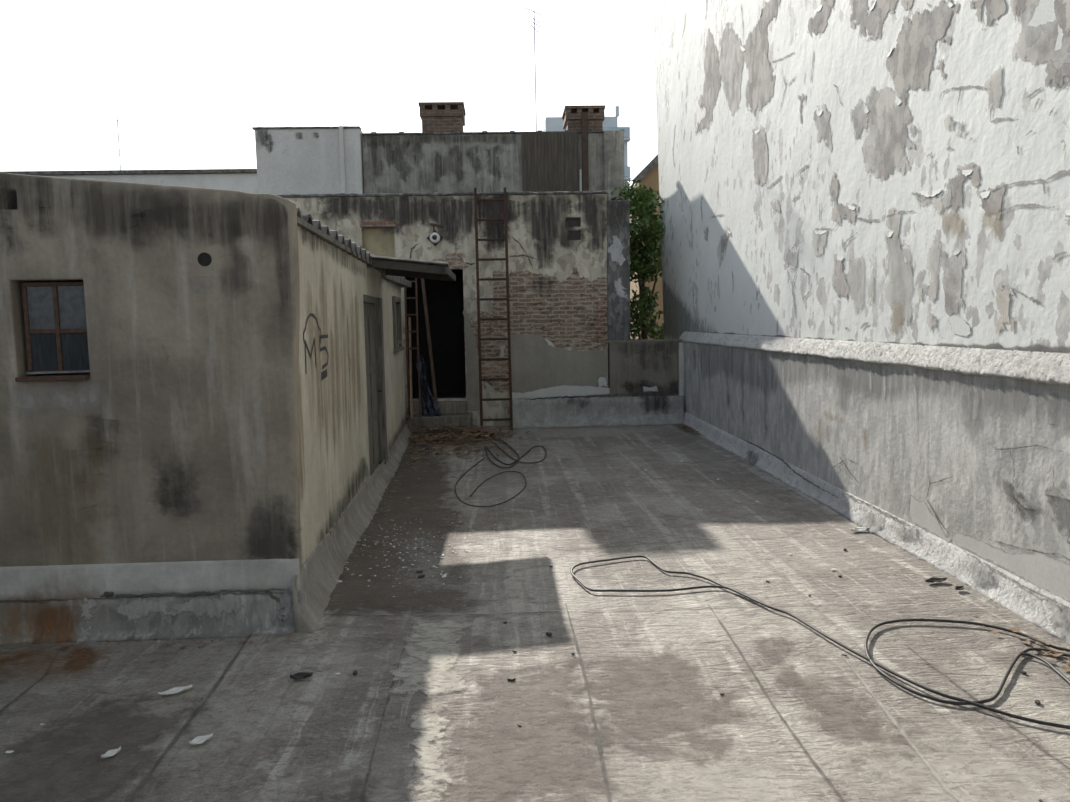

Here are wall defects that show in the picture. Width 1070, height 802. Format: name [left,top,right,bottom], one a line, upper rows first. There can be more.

peeling [807,0,834,37]
peeling [695,0,780,186]
peeling [849,0,1070,181]
water stain [367,135,510,180]
water stain [120,193,280,288]
water stain [321,194,622,268]
peeling [812,172,970,338]
flaking render [476,235,628,393]
crack [742,438,951,530]
crack [994,445,1070,511]
crack [964,539,1070,609]
water stain [430,652,750,802]